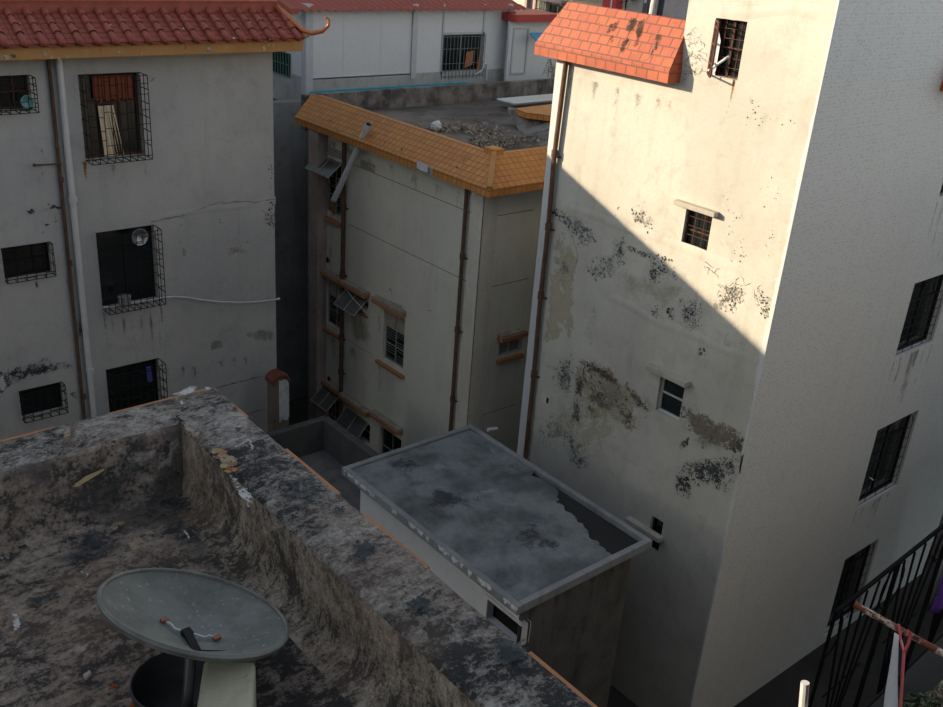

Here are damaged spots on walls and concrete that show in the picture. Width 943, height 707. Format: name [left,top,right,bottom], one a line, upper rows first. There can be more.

leakage [608,18,643,51]
mould [552,209,596,246]
mould [627,246,673,283]
mould [0,358,70,393]
spalling [209,448,243,475]
mould [675,457,741,499]